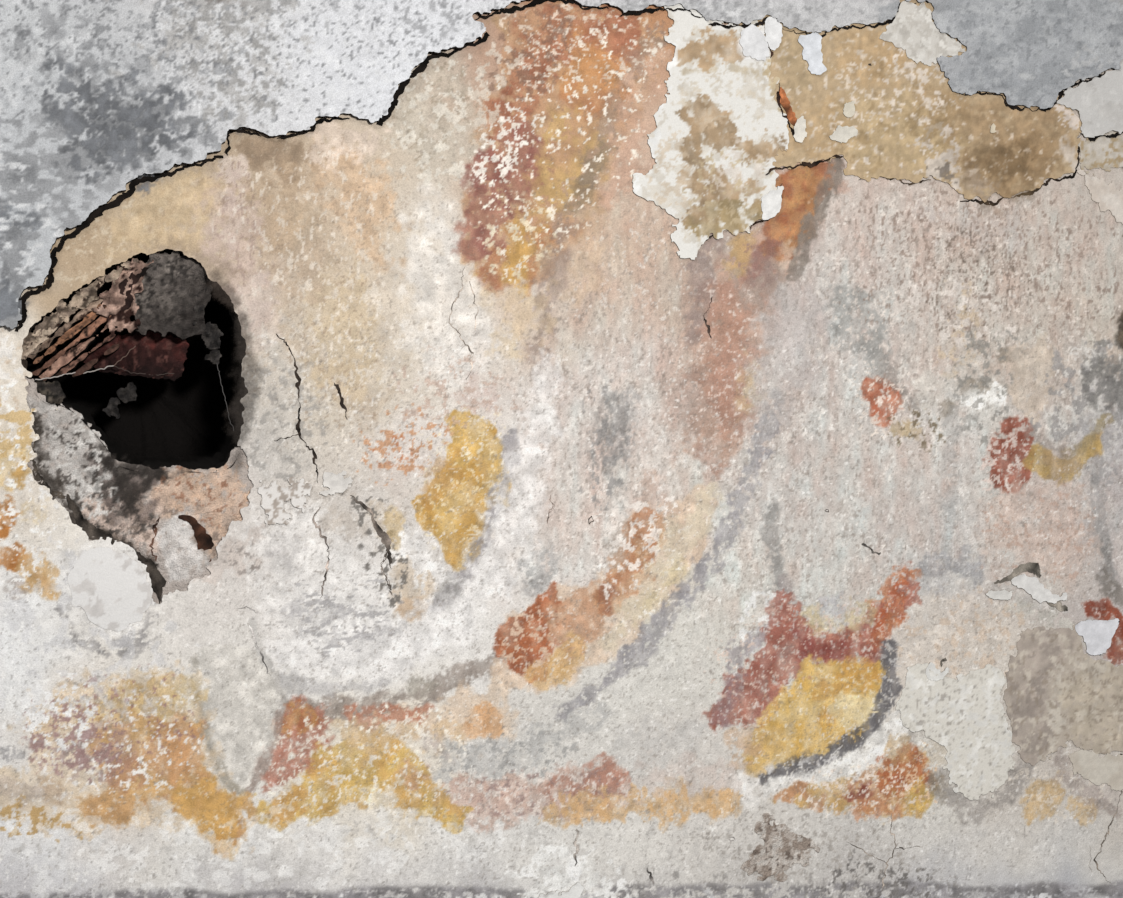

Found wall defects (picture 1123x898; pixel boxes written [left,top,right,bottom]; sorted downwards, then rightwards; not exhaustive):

flaking render [632,0,1123,260]
spalling [13,249,353,604]
crack [274,334,330,597]
crack [334,383,347,418]
crack [351,495,392,595]
peeling [986,562,1068,611]